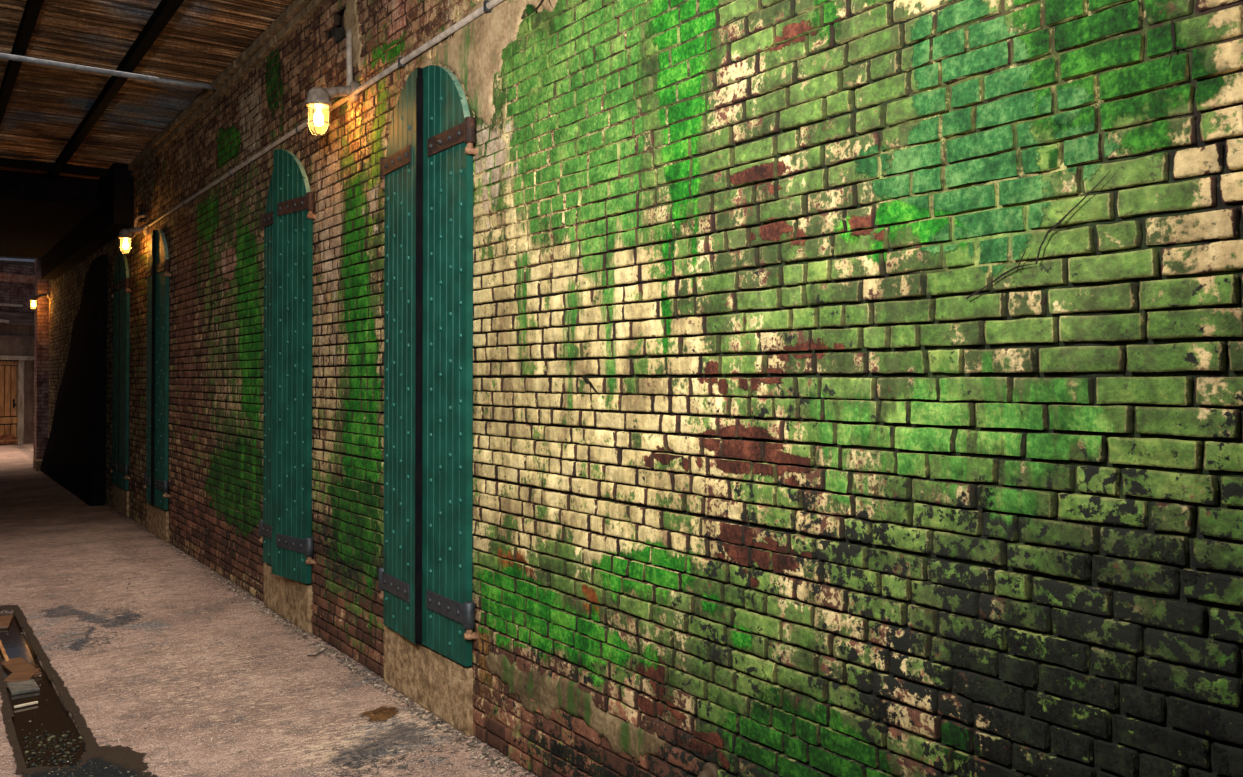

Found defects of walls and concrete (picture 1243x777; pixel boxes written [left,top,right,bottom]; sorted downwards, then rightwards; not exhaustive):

leakage [812,0,841,44]
leakage [315,151,382,382]
leakage [516,249,532,379]
leakage [564,281,582,409]
leakage [601,264,617,393]
leakage [658,171,700,358]
leakage [945,487,1004,525]
leakage [503,722,657,777]
leakage [854,688,900,732]
leakage [921,575,1243,777]